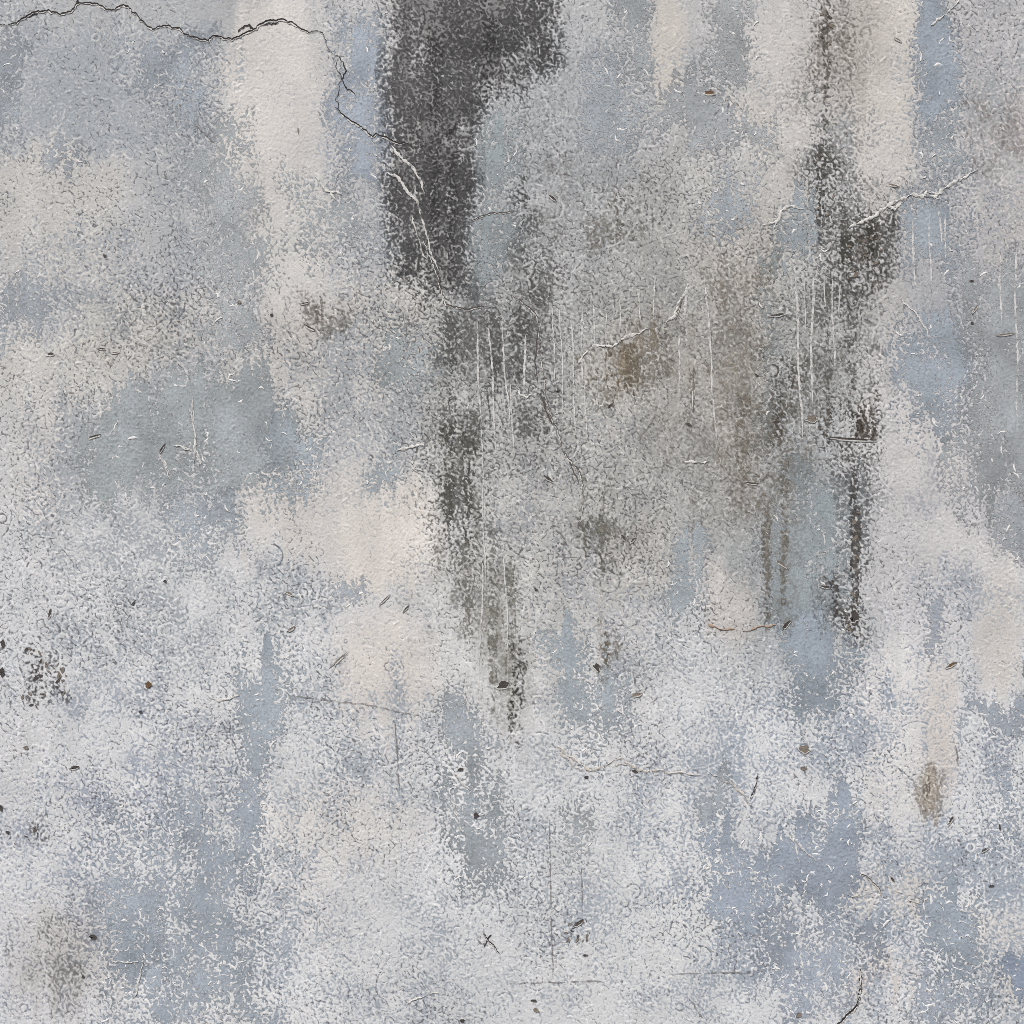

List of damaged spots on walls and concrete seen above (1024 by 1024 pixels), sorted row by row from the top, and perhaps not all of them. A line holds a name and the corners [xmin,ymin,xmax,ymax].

crack [0,0,488,311]
water stain [376,0,695,744]
water stain [703,0,899,639]
crack [848,169,978,229]